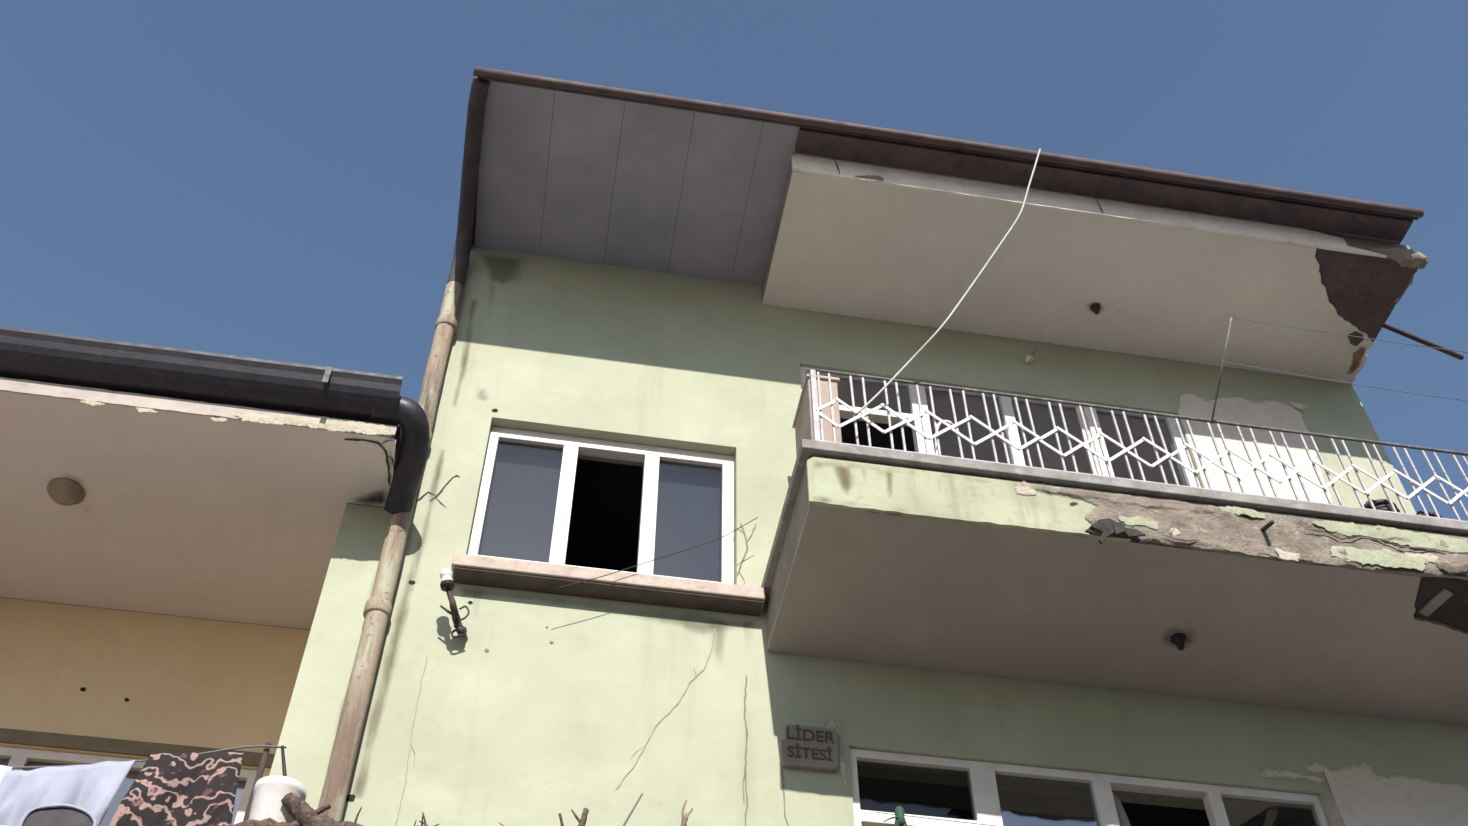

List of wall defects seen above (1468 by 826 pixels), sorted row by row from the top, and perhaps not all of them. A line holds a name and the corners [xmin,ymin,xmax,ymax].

spalling [1315,247,1428,346]
flaking render [1015,393,1468,632]
crack [615,627,716,790]
crack [742,676,788,826]
flaking render [1258,762,1468,826]